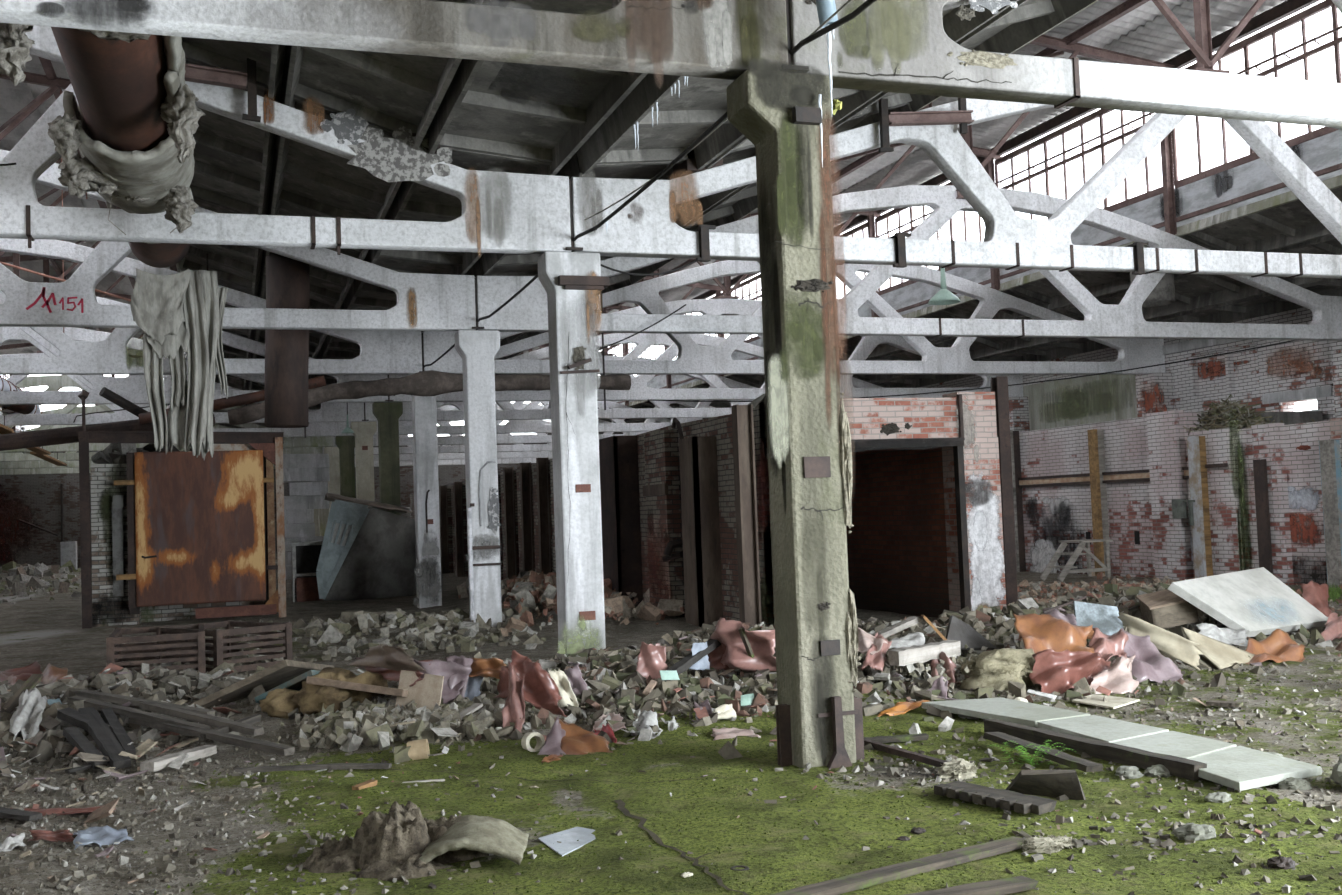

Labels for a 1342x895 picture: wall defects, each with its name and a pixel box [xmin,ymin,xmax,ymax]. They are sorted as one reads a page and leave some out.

water stain [39,0,151,27]
peeling [320,108,453,182]
rust [467,173,481,254]
rust [669,174,703,225]
water stain [798,128,813,223]
water stain [759,174,789,512]
flaking render [1289,513,1324,545]
crack [390,769,748,895]